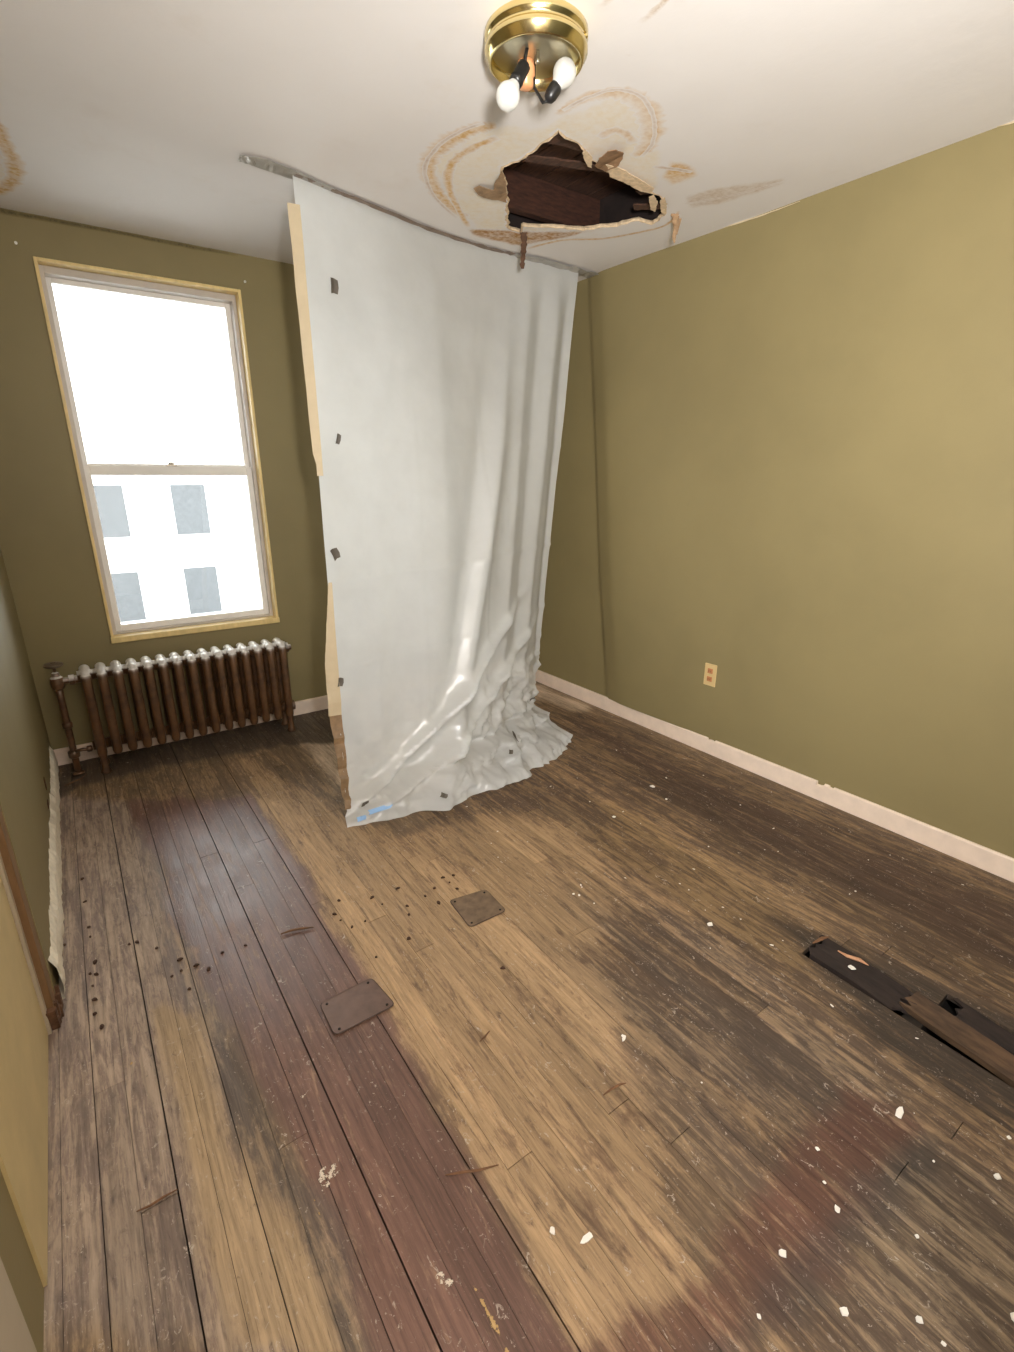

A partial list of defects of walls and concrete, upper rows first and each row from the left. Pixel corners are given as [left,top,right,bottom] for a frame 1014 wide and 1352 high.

crack [597,0,679,26]
leakage [0,120,30,197]
flaking render [474,130,682,269]
leakage [415,85,788,250]